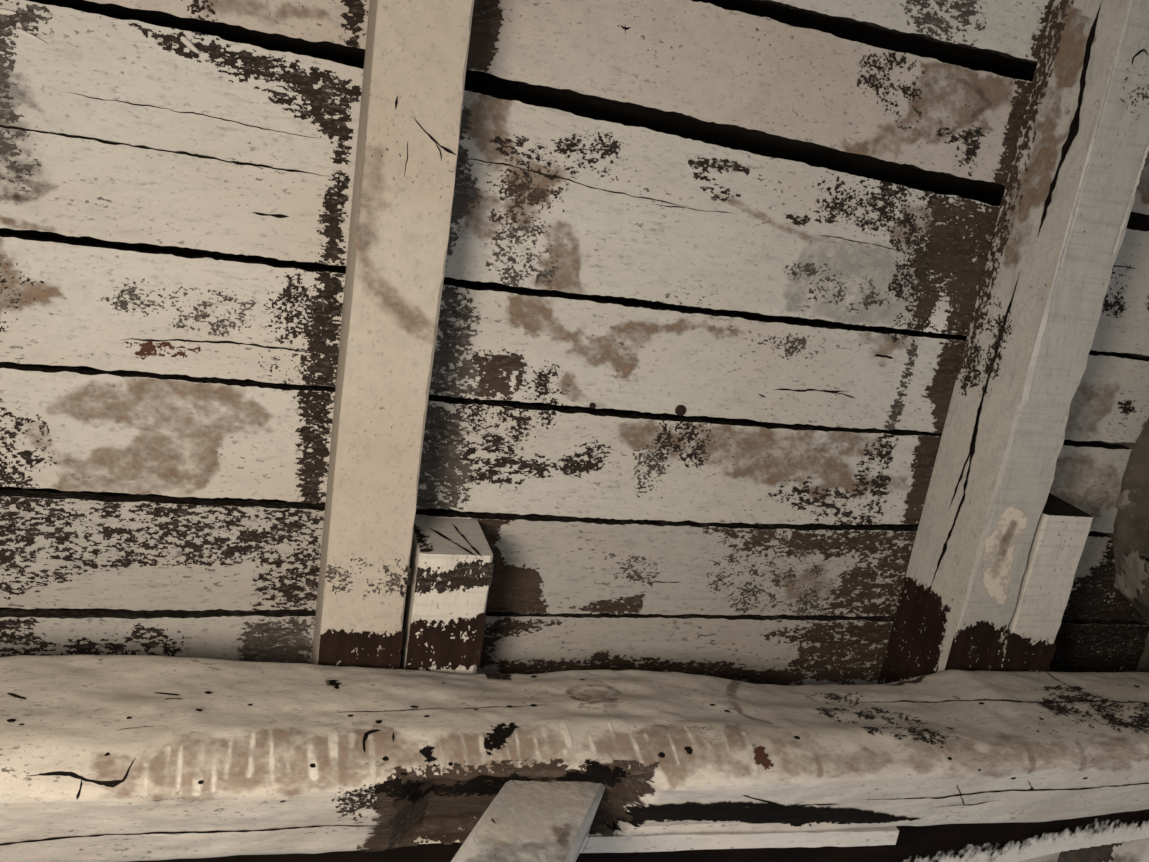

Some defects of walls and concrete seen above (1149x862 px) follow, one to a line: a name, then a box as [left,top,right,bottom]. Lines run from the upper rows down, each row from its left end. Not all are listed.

water stain [0,239,61,310]
peeling [0,0,1149,686]
water stain [509,297,695,378]
water stain [63,377,268,426]
water stain [696,425,880,501]
crack [931,272,1020,585]
crack [27,757,136,800]
water stain [95,727,418,800]
water stain [437,722,574,773]
water stain [587,722,758,787]
peeling [806,692,958,748]
peeling [1030,683,1149,734]